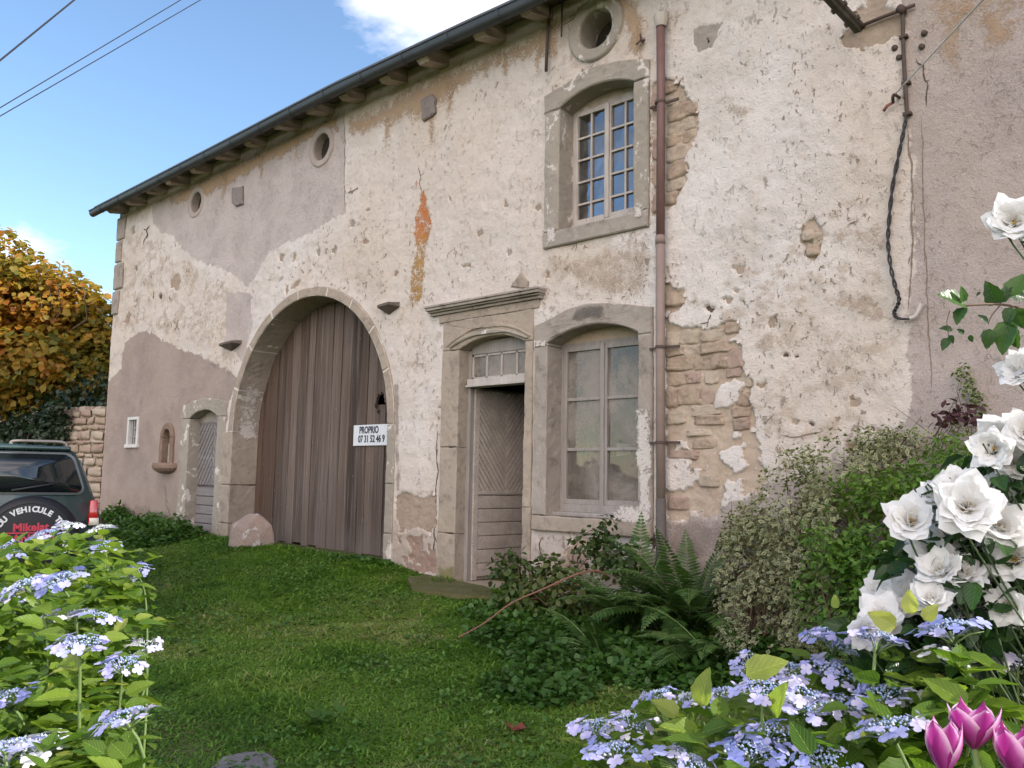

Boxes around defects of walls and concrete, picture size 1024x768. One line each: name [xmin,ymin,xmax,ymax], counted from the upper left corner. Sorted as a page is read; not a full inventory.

flaking render [693,22,723,52]
flaking render [839,0,906,52]
corrosion [409,180,432,306]
flaking render [796,221,827,264]
flaking render [170,274,181,291]
flaking render [395,491,437,574]